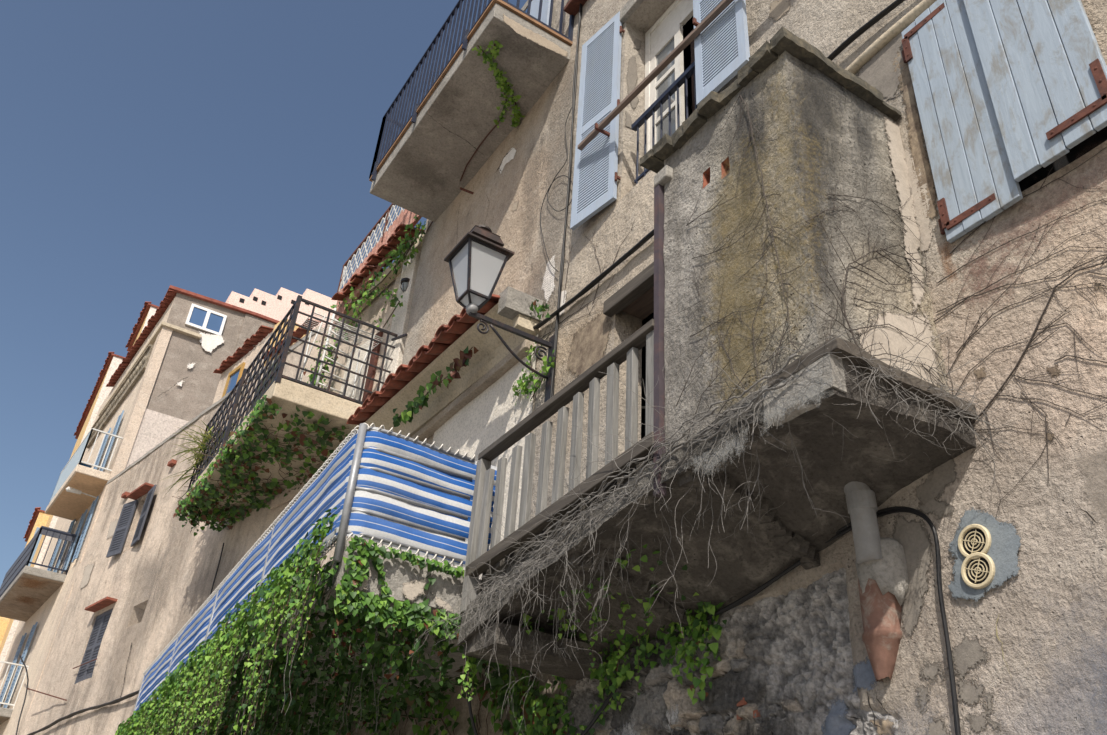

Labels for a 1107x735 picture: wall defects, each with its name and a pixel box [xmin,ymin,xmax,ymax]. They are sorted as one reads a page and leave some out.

peeling [499,148,516,174]
peeling [199,331,224,352]